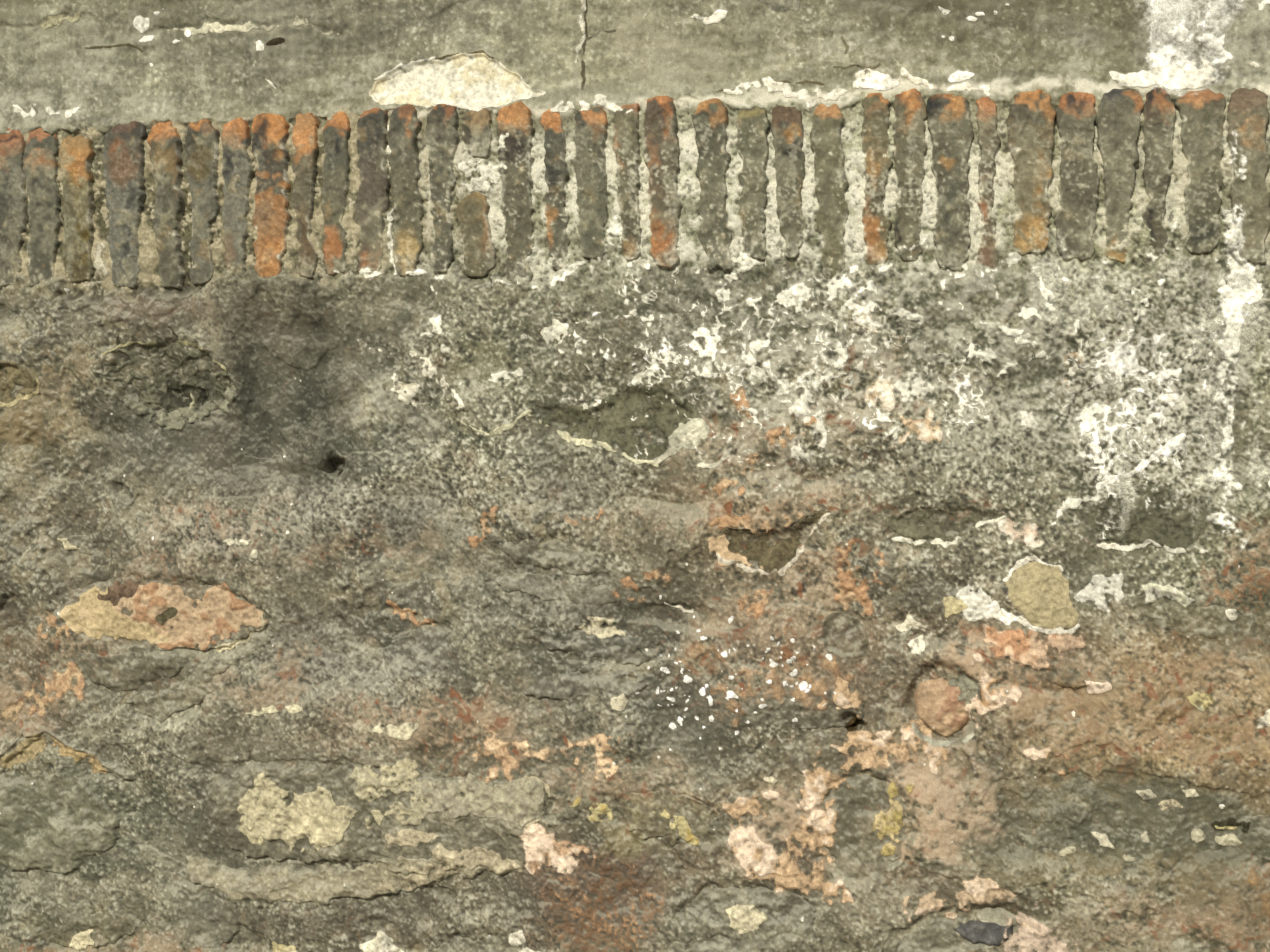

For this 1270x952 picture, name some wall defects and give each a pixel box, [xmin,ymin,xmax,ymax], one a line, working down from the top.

spalling [369,50,546,112]
flaking render [550,94,633,114]
crack [575,0,616,90]
efflorescence [1109,0,1244,96]